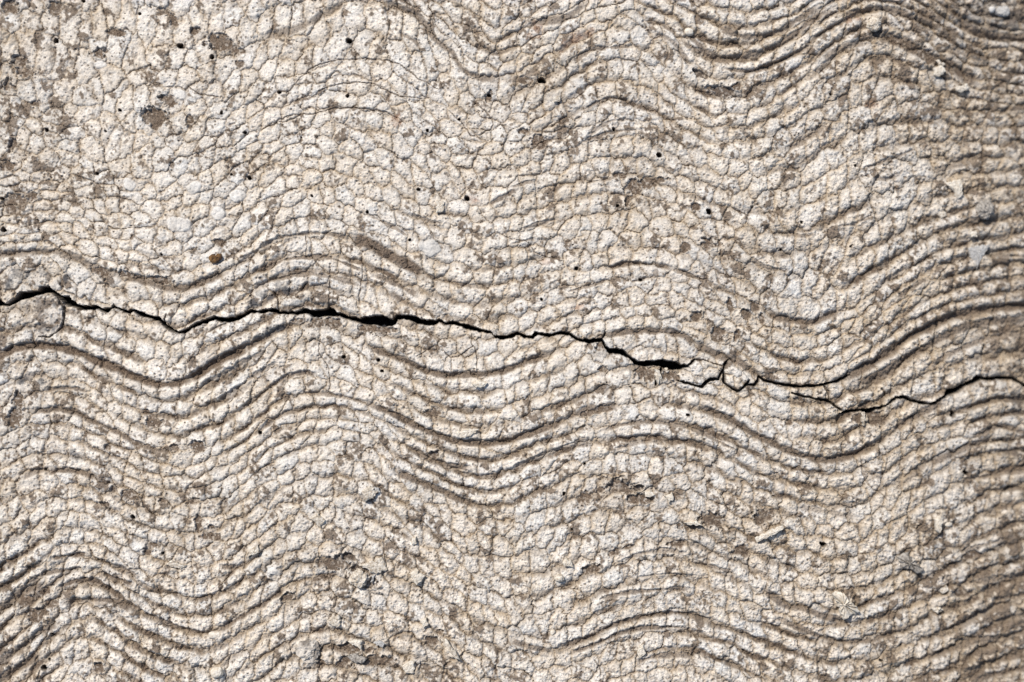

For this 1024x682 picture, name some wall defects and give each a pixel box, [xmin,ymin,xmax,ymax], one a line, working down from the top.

crack [863,0,1024,249]
crack [648,163,701,229]
crack [802,175,947,290]
crack [127,354,217,422]
crack [215,329,258,364]
crack [426,374,682,576]
crack [630,439,722,516]
crack [0,406,464,682]
crack [359,500,811,682]
crack [780,556,913,682]
crack [876,522,934,610]
crack [902,469,1024,682]